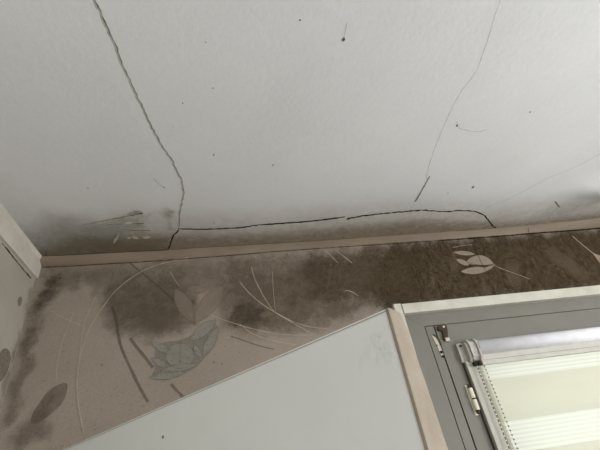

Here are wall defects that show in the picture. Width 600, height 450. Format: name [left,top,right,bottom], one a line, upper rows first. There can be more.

crack [43,0,600,268]
water stain [306,230,600,315]